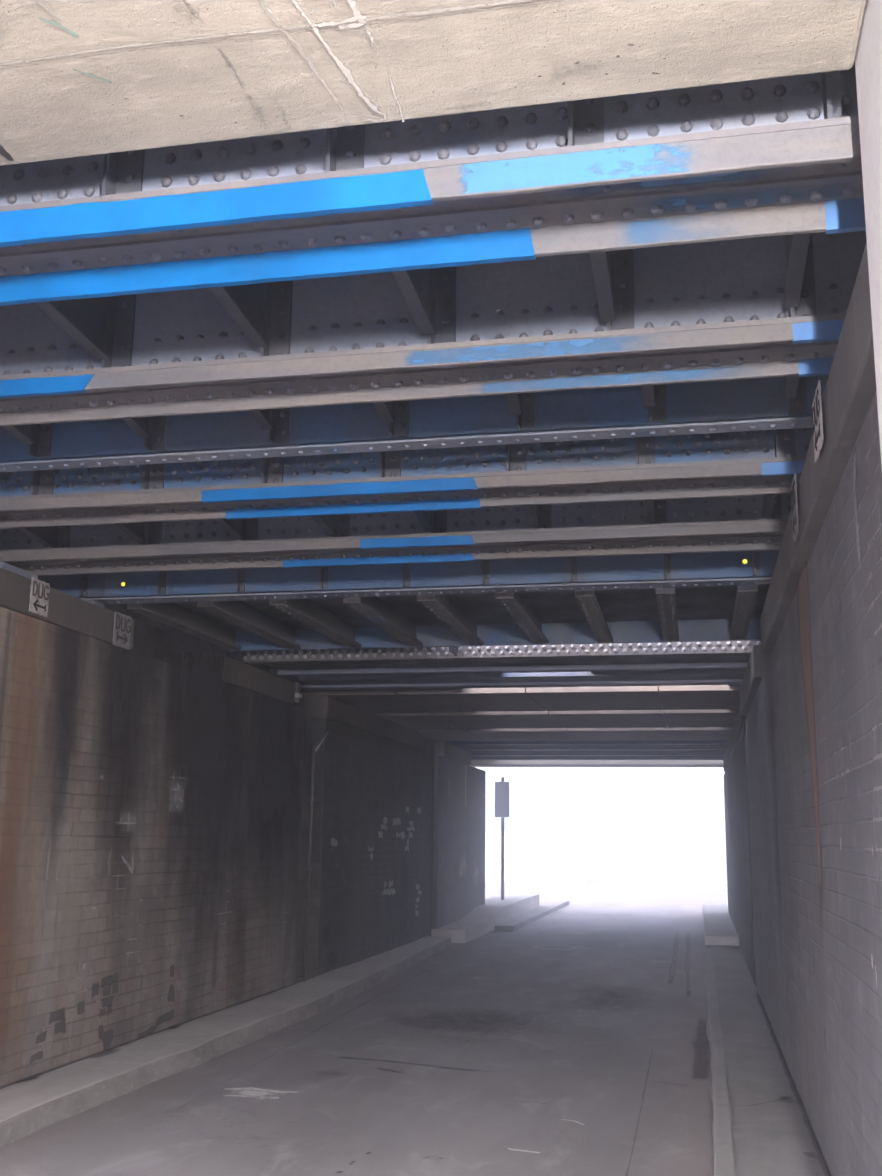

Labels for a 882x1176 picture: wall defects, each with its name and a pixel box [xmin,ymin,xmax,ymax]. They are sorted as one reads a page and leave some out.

leakage [54,625,81,811]
leakage [98,596,307,898]
spalling [30,973,118,1064]